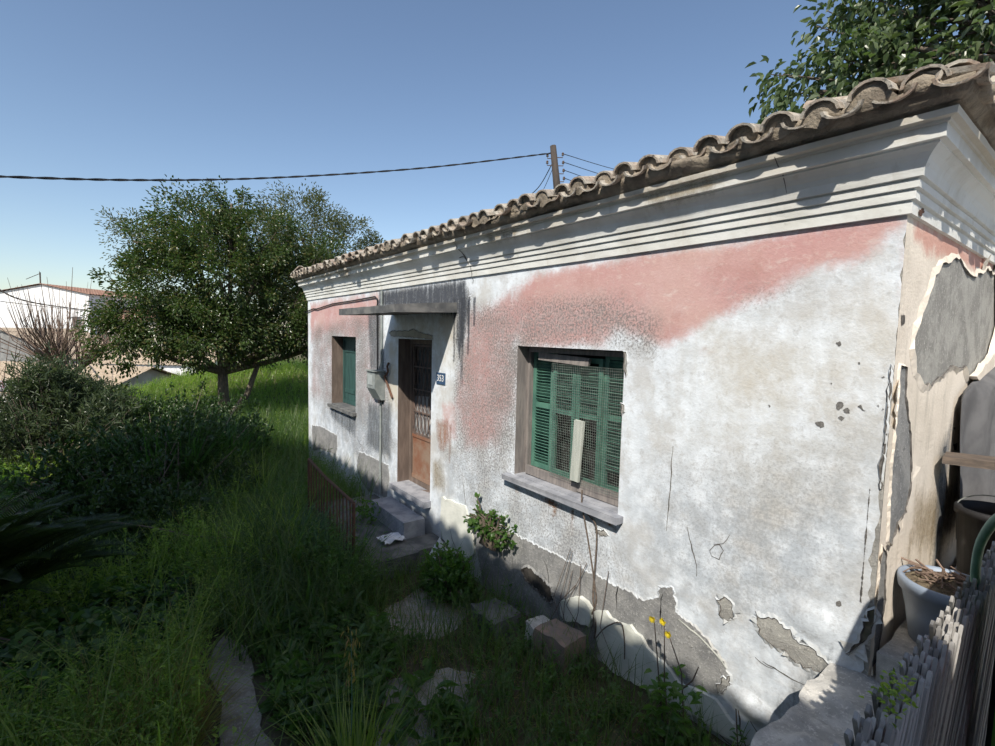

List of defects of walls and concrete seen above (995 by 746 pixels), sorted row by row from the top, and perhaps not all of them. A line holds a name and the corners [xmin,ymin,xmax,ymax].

water stain [369,280,476,377]
crack [666,450,730,576]
crack [860,489,870,603]
spalling [836,253,995,676]
spalling [439,496,741,745]
spalling [715,593,833,676]